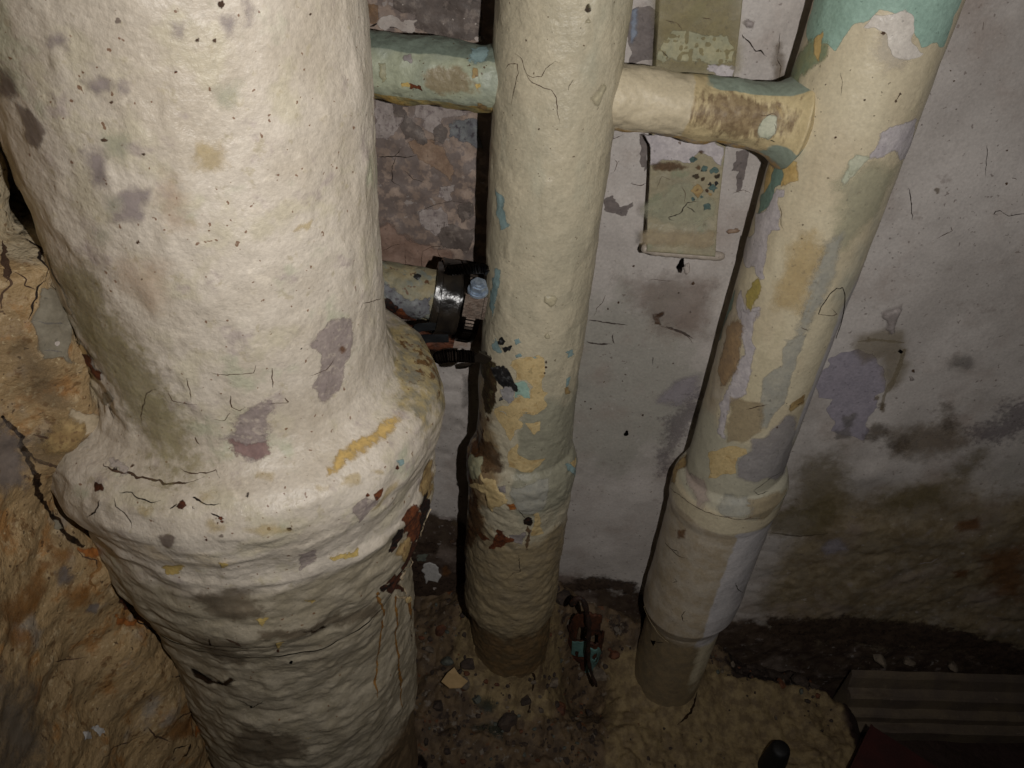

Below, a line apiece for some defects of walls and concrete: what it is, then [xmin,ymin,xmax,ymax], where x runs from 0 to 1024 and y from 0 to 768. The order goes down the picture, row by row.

crack [506,54,572,118]
peeling [758,110,783,142]
flaking render [374,99,483,269]
peeling [789,395,805,411]
peeling [816,349,886,440]
crack [31,435,58,468]
peeling [468,355,548,544]
crack [87,463,224,525]
rust [373,592,412,707]
leakage [767,614,1024,675]